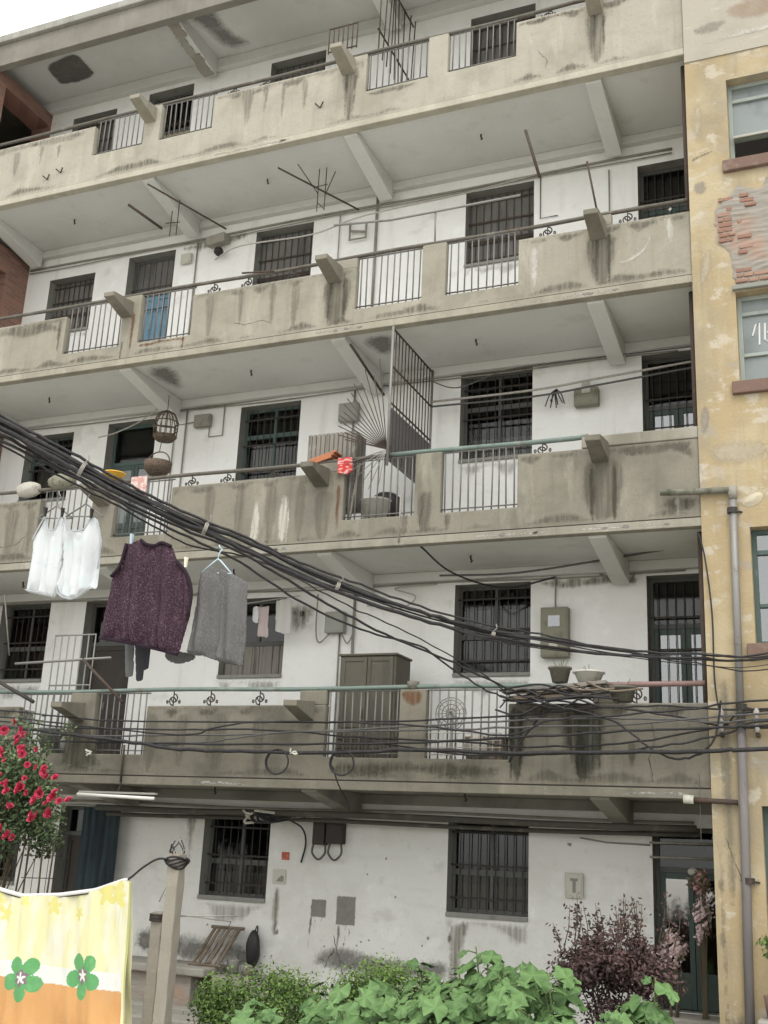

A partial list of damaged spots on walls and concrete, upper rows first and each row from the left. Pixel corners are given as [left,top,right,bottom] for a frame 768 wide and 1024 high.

damp [194,14,243,45]
damp [590,14,604,47]
damp [49,55,94,84]
flaking render [702,177,768,284]
damp [585,462,617,517]
damp [250,502,259,542]
damp [278,497,289,542]
damp [509,711,523,774]
damp [564,712,602,777]